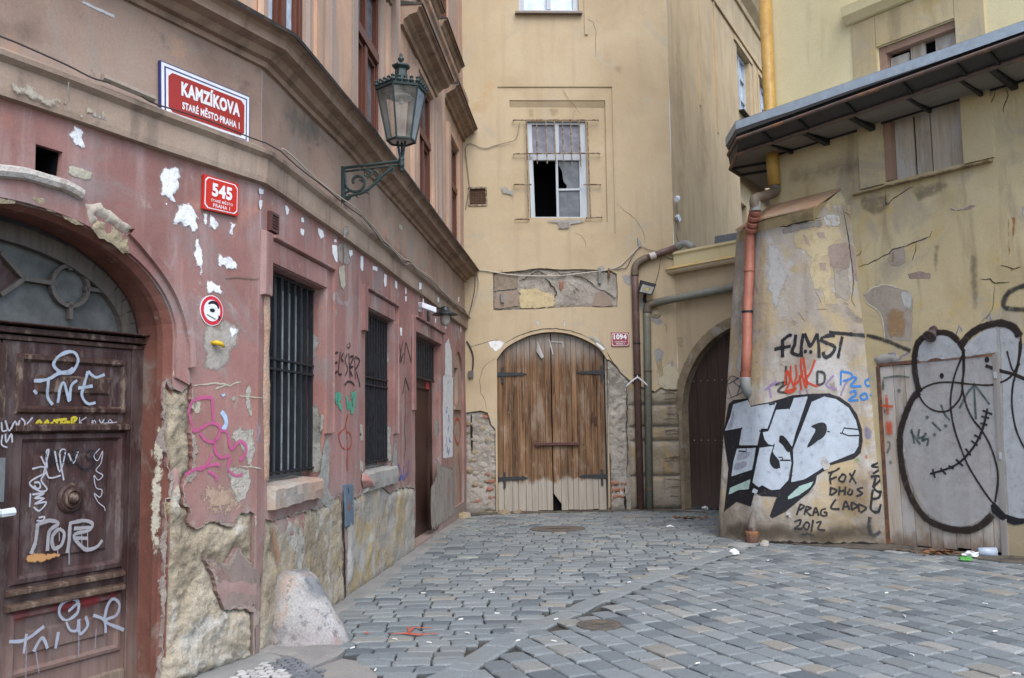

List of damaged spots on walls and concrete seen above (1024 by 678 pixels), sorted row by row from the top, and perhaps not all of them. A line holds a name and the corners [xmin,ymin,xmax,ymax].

spalling [150,296,416,678]